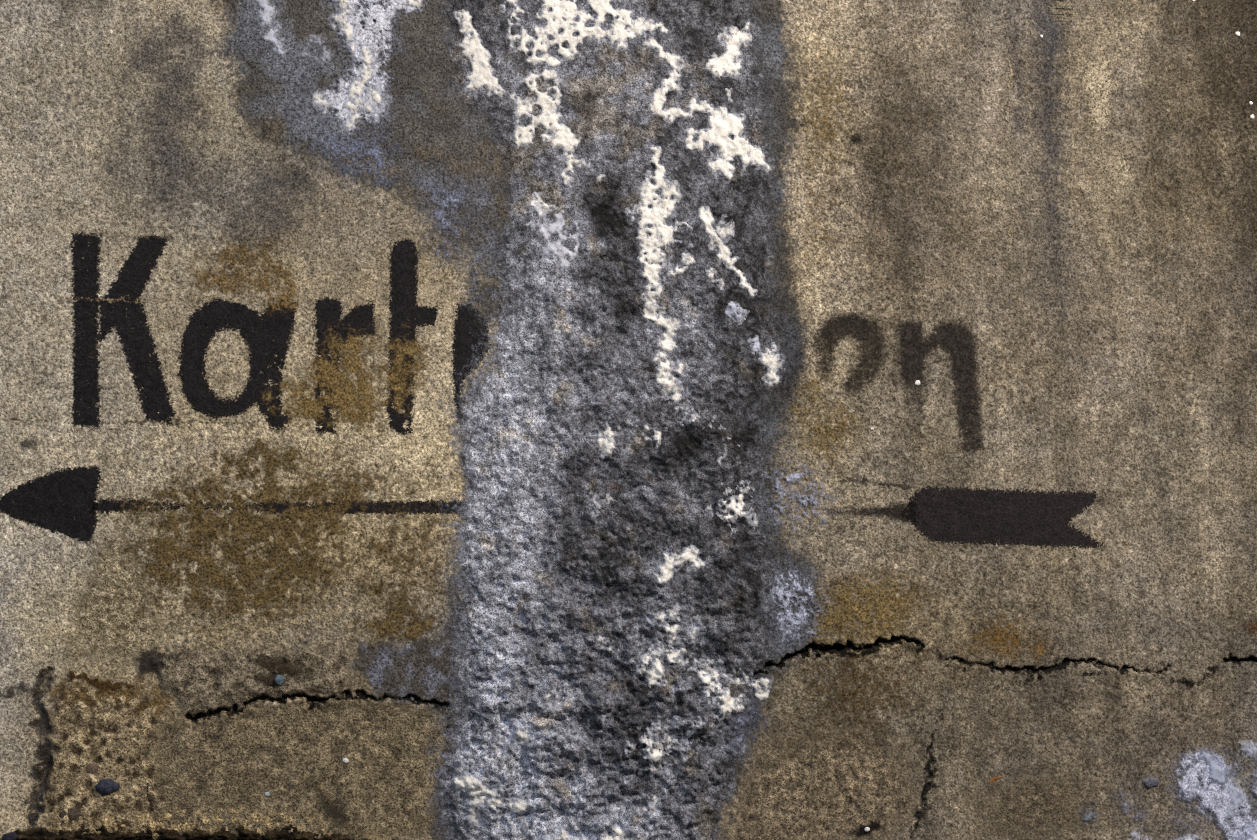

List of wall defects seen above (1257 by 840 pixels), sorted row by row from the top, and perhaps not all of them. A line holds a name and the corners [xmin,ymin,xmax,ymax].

rust [196,236,299,310]
rust [263,332,428,430]
water stain [127,0,836,840]
rust [104,438,454,641]
crack [186,690,455,727]
crack [754,635,1257,688]
crack [909,709,945,840]
water stain [1115,787,1152,840]
water stain [1167,741,1257,840]